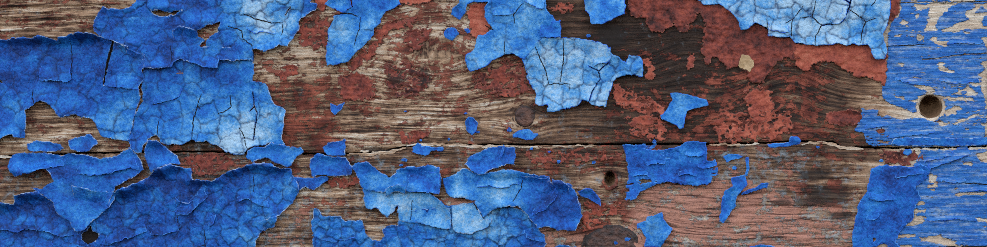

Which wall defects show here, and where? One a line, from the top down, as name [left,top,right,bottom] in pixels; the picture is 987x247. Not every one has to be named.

crack [103,41,113,84]
crack [228,7,291,50]
peeling [444,0,655,112]
crack [535,39,608,101]
crack [767,0,876,46]
crack [153,93,257,148]
peeling [0,0,601,247]
peeling [660,93,708,129]
peeling [698,0,987,247]
peeling [592,128,769,223]
peeling [614,212,673,247]